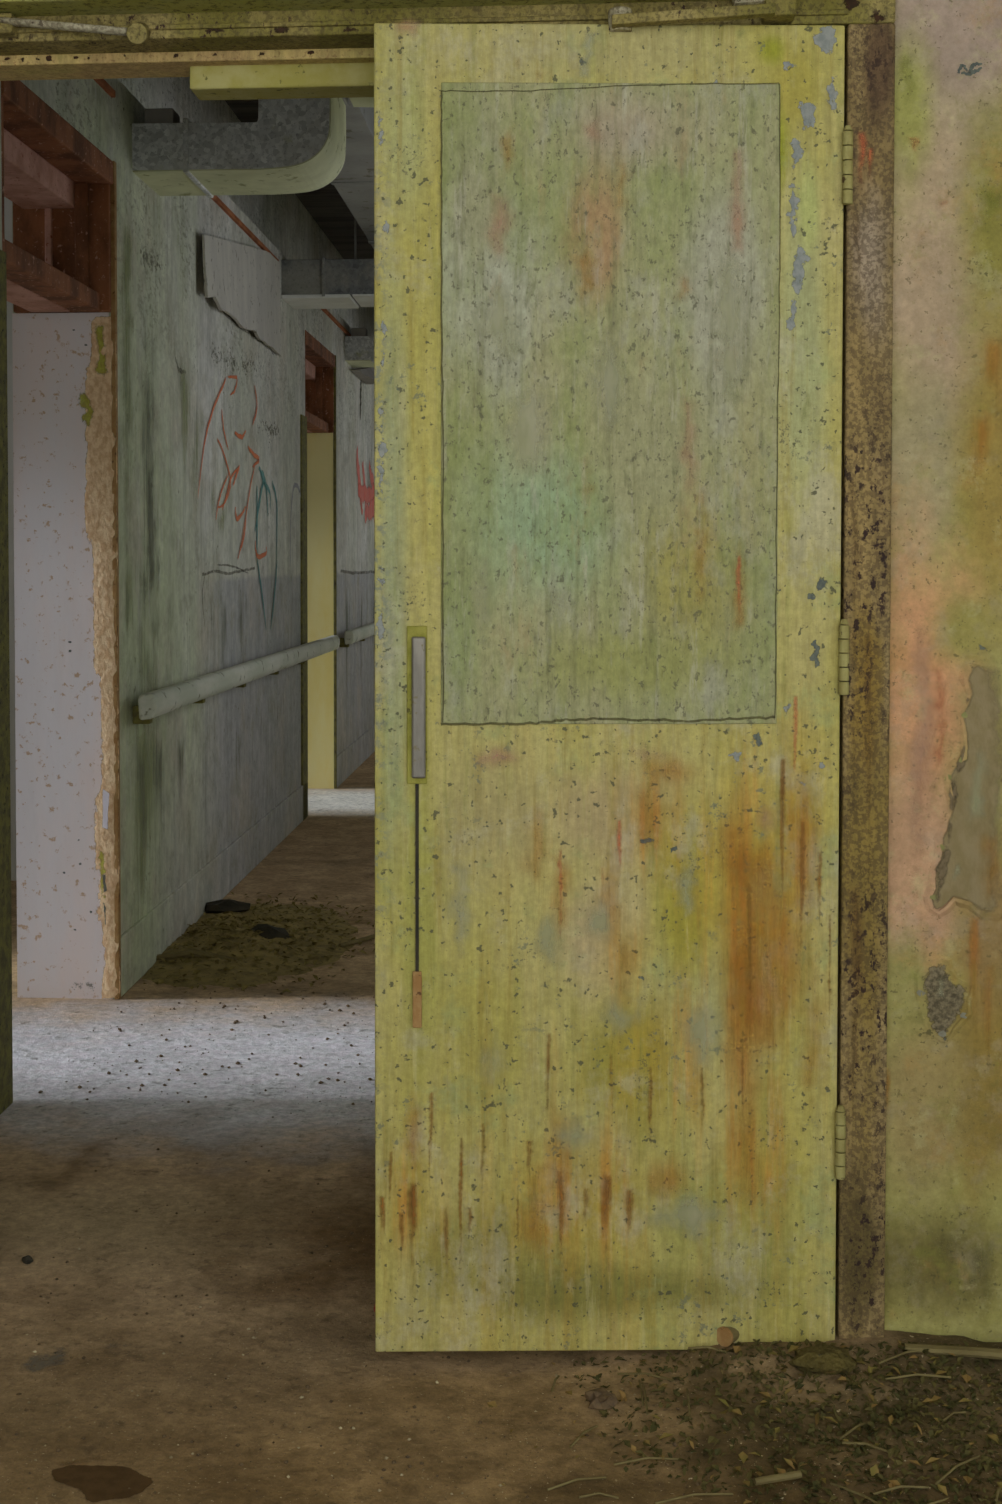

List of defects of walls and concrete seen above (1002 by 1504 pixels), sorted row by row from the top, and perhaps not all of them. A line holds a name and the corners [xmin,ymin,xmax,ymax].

peeling [813,25,837,54]
peeling [786,77,838,330]
crack [224,312,274,355]
peeling [923,645,1002,921]
rust [781,760,821,919]
flaking render [914,954,973,1047]
rust [380,1158,416,1241]
rust [445,1144,472,1244]
rust [587,1178,632,1223]